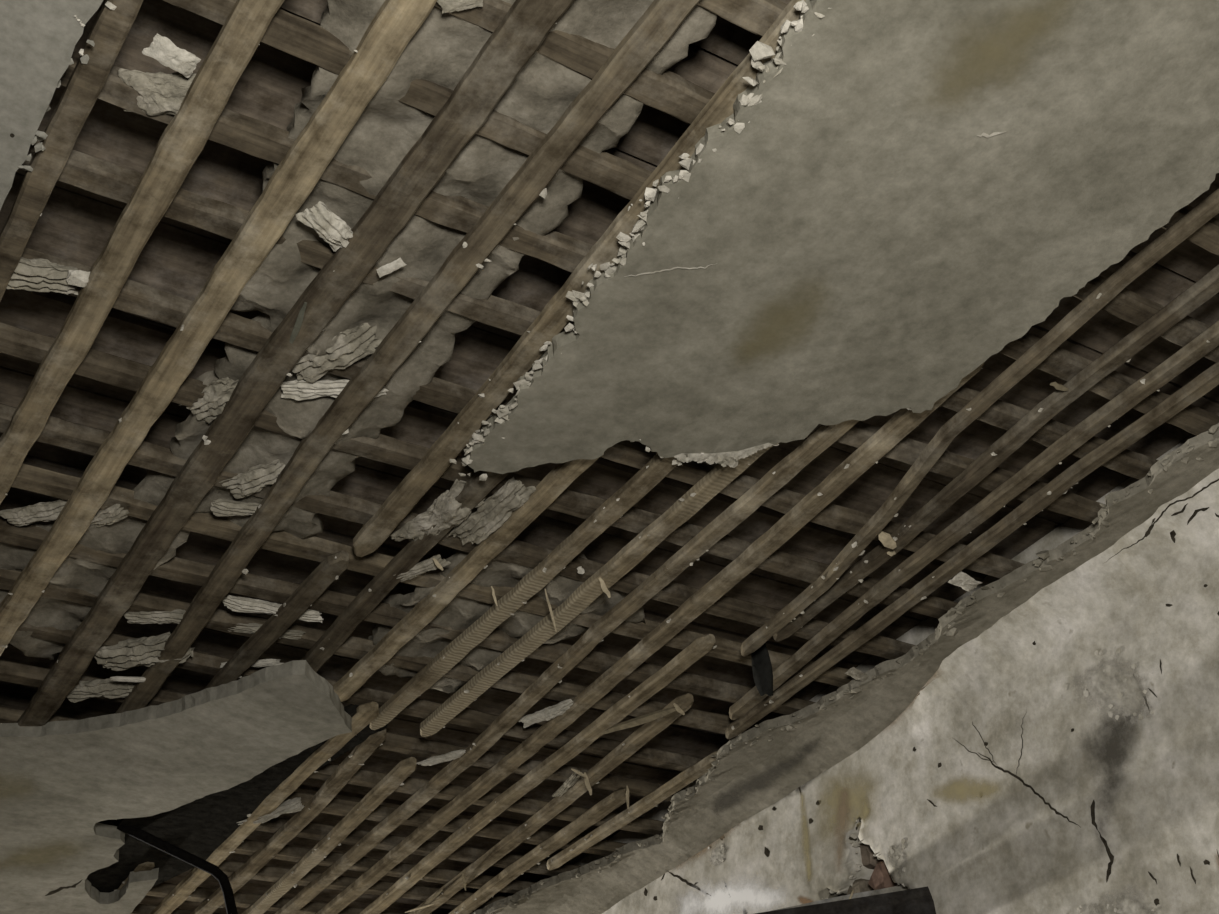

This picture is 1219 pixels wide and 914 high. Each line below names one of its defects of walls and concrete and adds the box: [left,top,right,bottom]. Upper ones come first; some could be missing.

spalling [60,15,95,65]
spalling [719,0,831,134]
spalling [18,130,48,172]
spalling [564,143,717,334]
spalling [449,341,562,481]
spalling [630,439,779,468]
crack [1109,479,1219,559]
spalling [1063,648,1154,724]
spalling [568,713,803,880]
crack [953,717,1114,883]
spalling [873,839,909,890]
spalling [1077,890,1159,914]